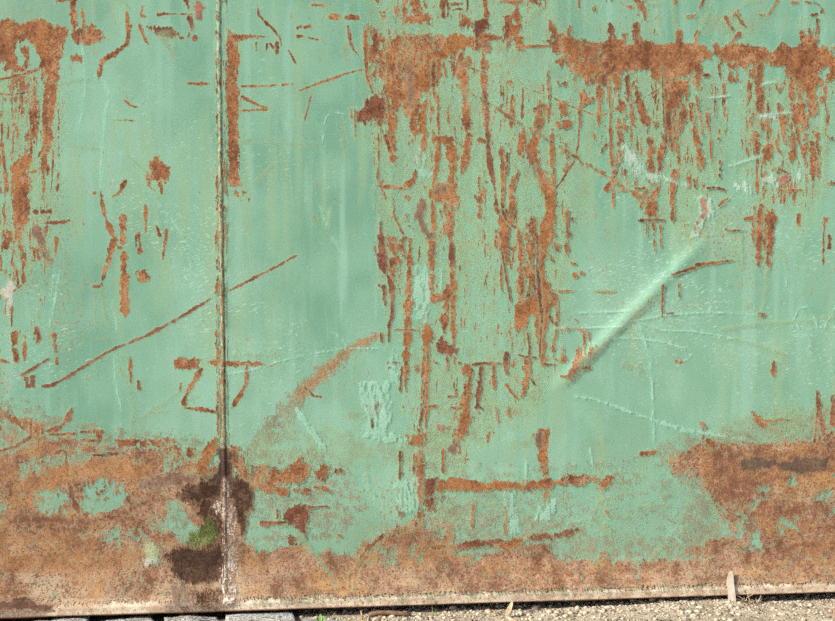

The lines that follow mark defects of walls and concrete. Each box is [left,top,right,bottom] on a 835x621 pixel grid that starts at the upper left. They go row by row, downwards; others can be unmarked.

rust [724,9,746,30]
rust [0,0,109,363]
rust [473,171,489,219]
rust [685,169,725,201]
rust [117,204,169,317]
rust [822,217,832,265]
rust [214,275,226,329]
damp [163,446,254,609]